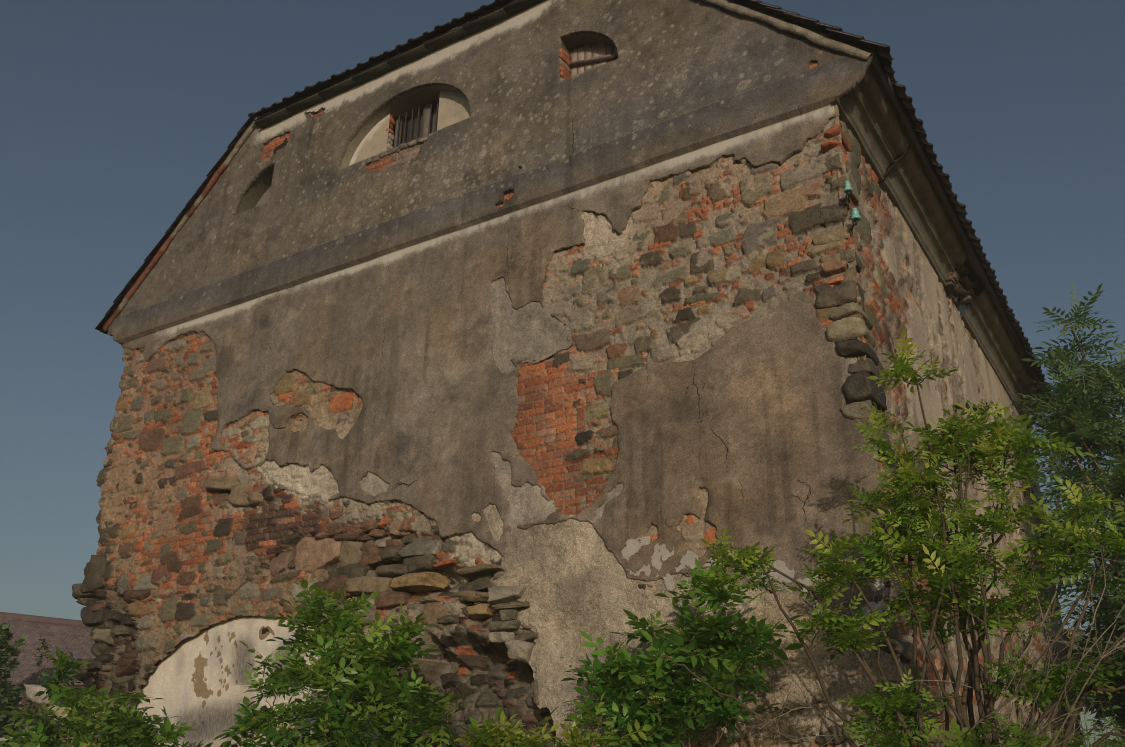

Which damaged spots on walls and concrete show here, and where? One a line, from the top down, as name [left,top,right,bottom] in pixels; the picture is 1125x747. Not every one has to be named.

spalling [67,115,906,747]
crack [686,367,744,501]